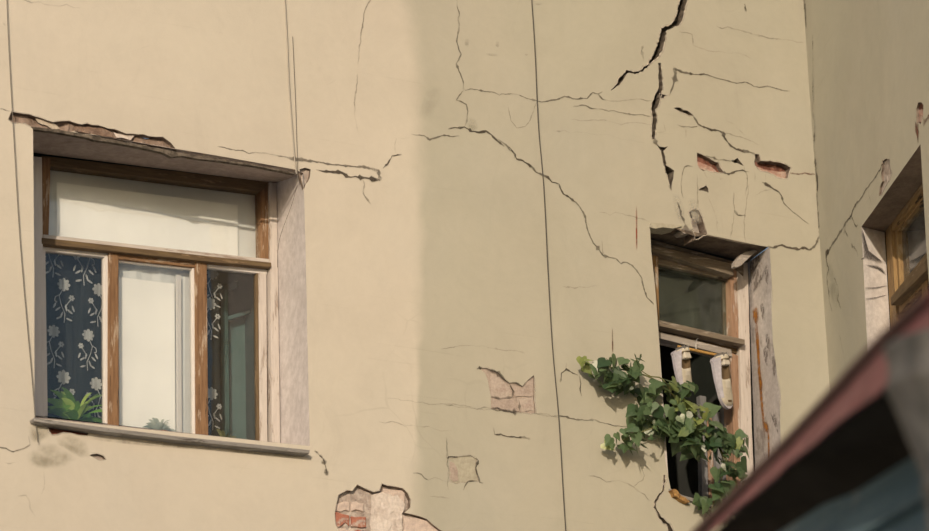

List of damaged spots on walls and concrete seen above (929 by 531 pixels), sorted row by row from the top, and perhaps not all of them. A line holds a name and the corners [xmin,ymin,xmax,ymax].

spalling [8,112,177,152]
crack [293,154,399,182]
crack [520,0,885,299]
spalling [696,153,724,173]
spalling [754,153,792,179]
crack [428,127,653,303]
peeling [478,366,536,414]
peeling [447,455,480,488]
spalling [334,483,442,531]
crack [653,474,674,531]